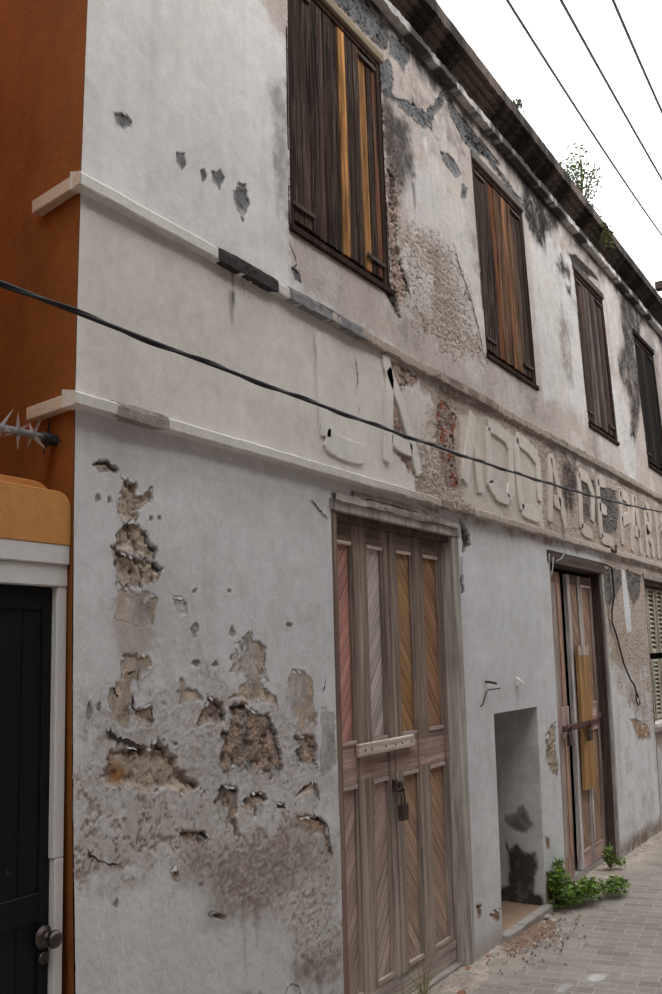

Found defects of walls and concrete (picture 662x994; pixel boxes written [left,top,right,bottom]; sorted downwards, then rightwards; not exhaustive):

spalling [114,110,133,128]
flaking render [333,0,523,203]
spalling [200,170,225,190]
spalling [234,184,249,221]
spalling [387,170,407,318]
spalling [397,452,415,475]
spalling [92,459,160,628]
spalling [581,481,619,534]
peeling [86,653,155,728]
spalling [102,739,197,795]
spalling [177,627,281,835]
peeling [288,670,319,796]